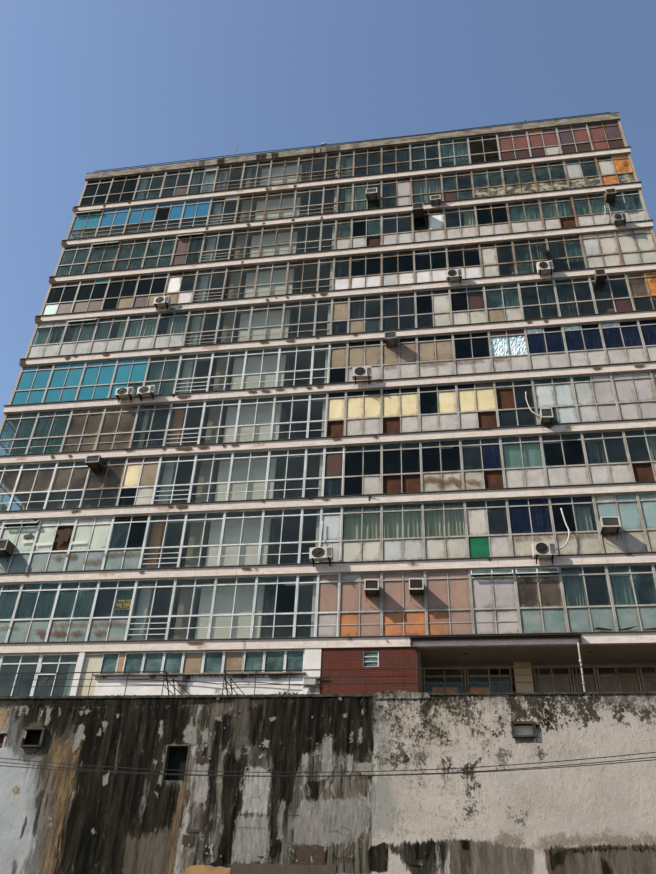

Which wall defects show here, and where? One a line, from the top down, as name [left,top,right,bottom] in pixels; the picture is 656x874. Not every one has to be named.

corrosion [423,477,480,489]
corrosion [36,622,124,639]
peeling [0,705,62,733]
peeling [183,716,211,763]
leakage [385,736,409,770]
leakage [388,694,632,760]
leakage [0,673,374,874]
leakage [436,756,486,820]
spalling [182,829,198,846]
spalling [203,844,223,868]
spalling [296,844,326,865]
leakage [368,838,656,874]